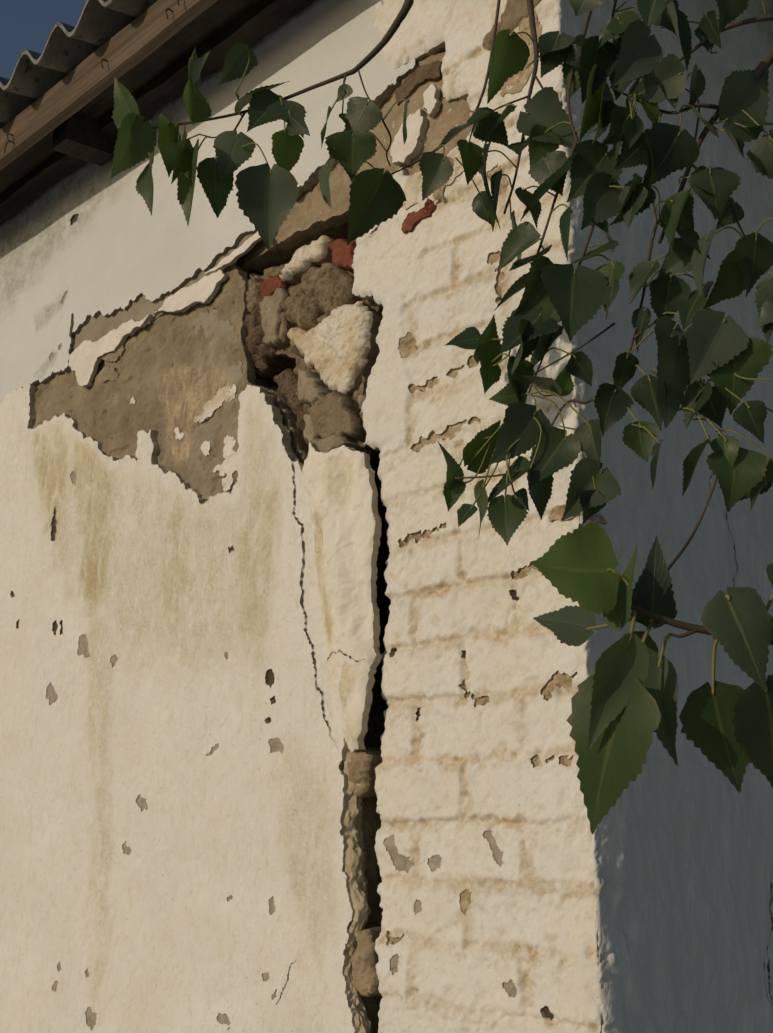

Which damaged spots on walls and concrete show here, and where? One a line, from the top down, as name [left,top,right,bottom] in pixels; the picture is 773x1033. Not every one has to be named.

spalling [482,0,542,97]
spalling [401,152,464,234]
peeling [33,231,262,503]
spalling [399,332,418,358]
leakage [164,367,233,460]
spalling [78,634,91,658]
crack [288,441,383,1033]
spalling [384,835,415,873]
spalling [428,855,442,872]
spalling [483,831,503,866]
spalling [390,954,399,975]
crack [764,883,773,1003]